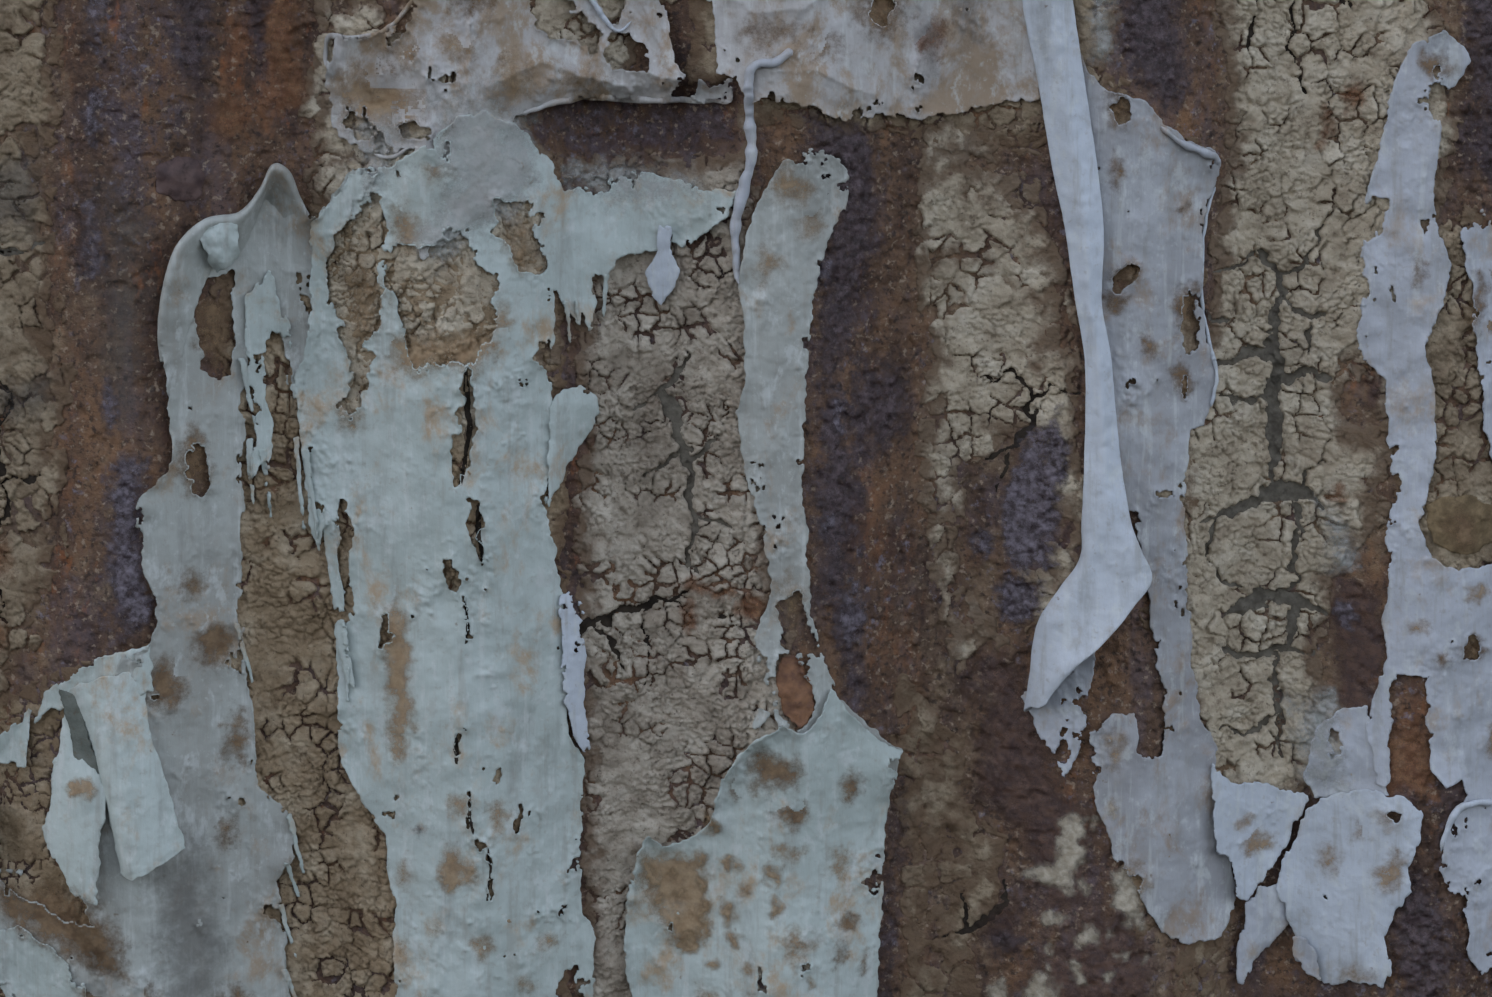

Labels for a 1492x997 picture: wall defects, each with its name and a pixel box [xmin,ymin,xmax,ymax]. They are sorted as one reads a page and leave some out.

crack [1246,0,1307,94]
crack [0,380,41,527]
peeling [0,0,903,997]
crack [579,351,734,685]
rust [775,116,908,699]
peeling [684,0,1236,945]
crack [1200,214,1333,758]
peeling [1179,0,1492,988]
rust [0,885,126,978]
peeling [889,673,1009,997]
rust [976,663,1087,905]
rust [1009,919,1154,997]